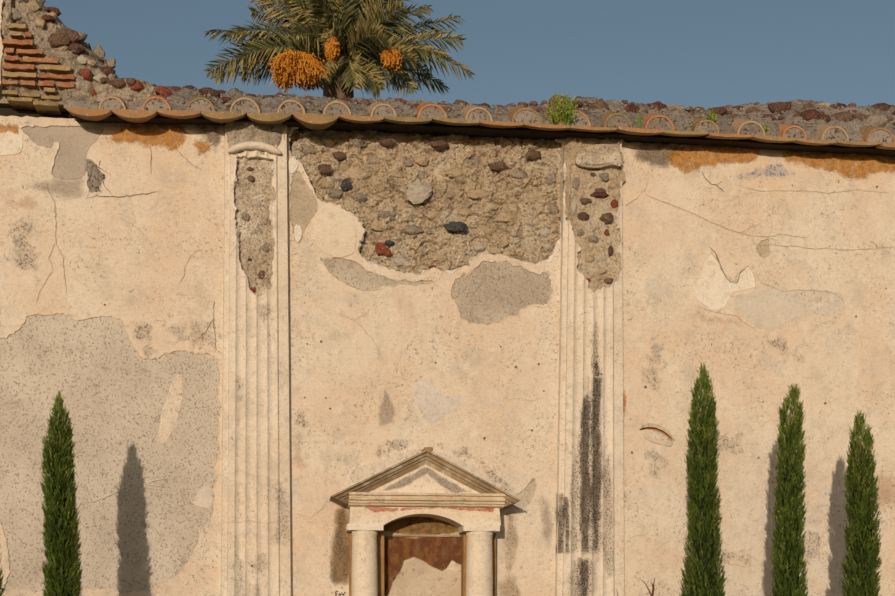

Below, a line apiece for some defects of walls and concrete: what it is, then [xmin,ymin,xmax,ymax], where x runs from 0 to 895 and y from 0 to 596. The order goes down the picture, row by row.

crack [37,181,67,299]
flaking render [2,90,106,195]
water stain [112,124,219,155]
spalling [233,157,276,297]
spalling [288,127,626,325]
flaking render [694,253,756,310]
crack [627,176,887,250]
water stain [638,144,895,178]
crack [712,249,844,333]
flaking render [0,304,222,594]
flaking render [515,478,536,509]
water stain [556,330,613,596]